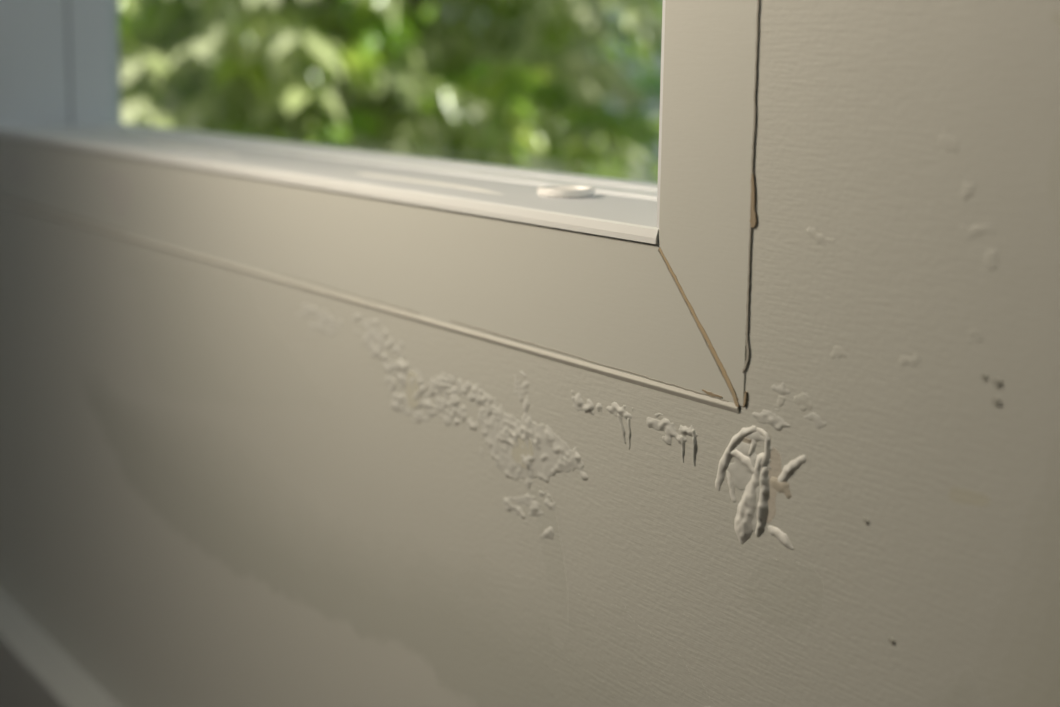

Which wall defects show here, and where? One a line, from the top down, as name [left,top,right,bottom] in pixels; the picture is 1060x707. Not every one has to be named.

water stain [79,258,718,707]
peeling [571,390,633,450]
peeling [646,413,698,466]
peeling [715,425,807,550]
water stain [920,429,1060,707]